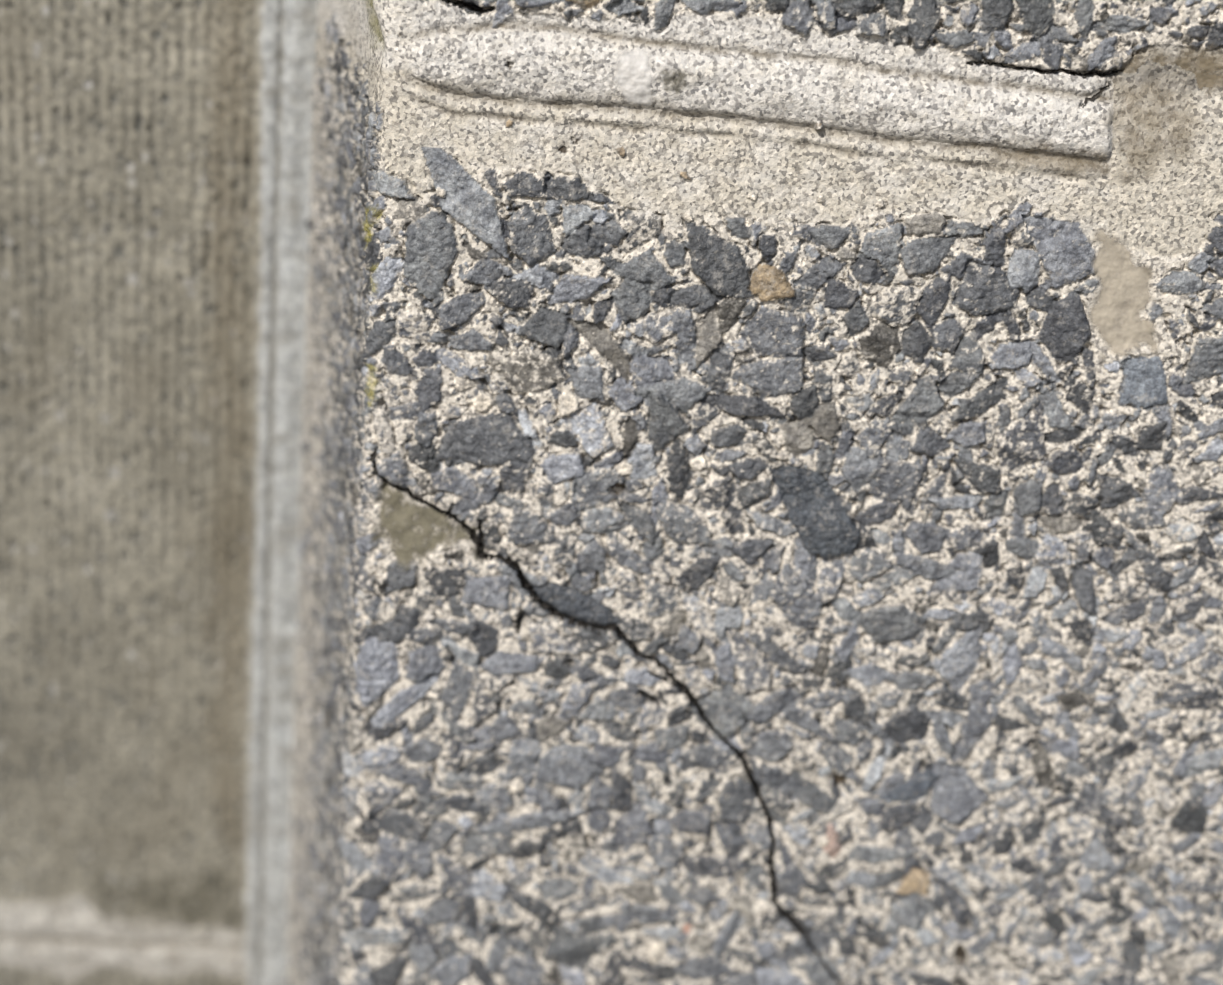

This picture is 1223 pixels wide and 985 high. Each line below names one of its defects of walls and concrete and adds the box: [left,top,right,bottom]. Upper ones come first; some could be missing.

crack [370,447,841,985]